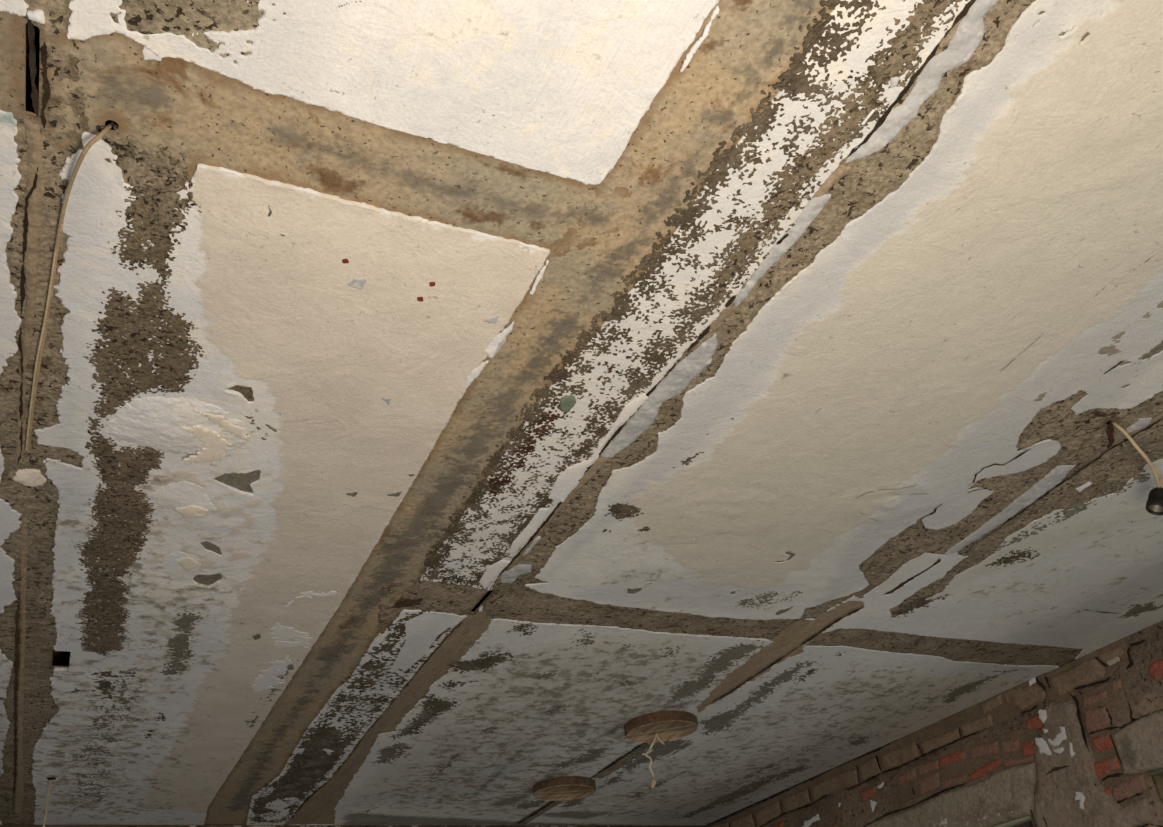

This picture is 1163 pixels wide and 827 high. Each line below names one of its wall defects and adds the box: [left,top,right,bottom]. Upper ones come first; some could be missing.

peeling [0,0,633,824]
peeling [284,0,1163,827]
damp [245,610,453,824]
damp [506,620,538,636]
damp [344,640,821,826]
damp [570,629,604,648]
damp [891,594,954,618]
crack [1020,640,1162,803]